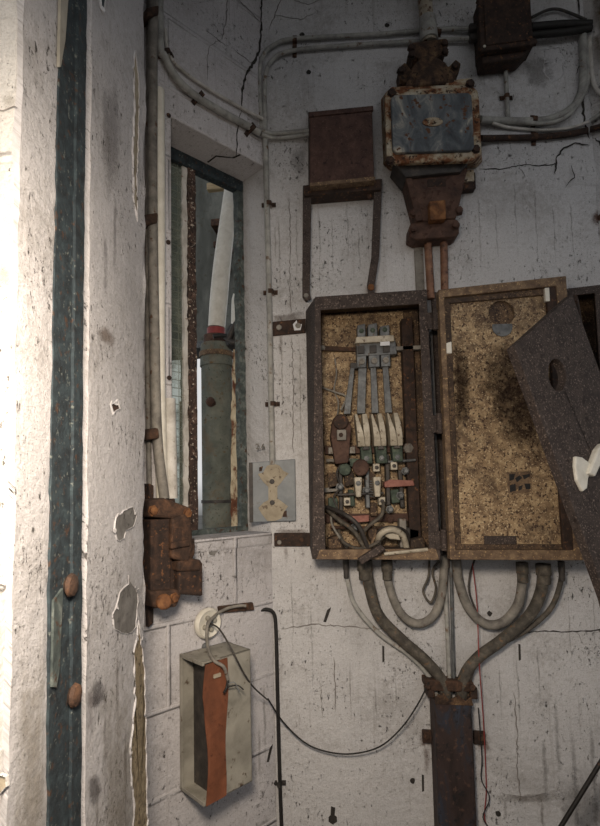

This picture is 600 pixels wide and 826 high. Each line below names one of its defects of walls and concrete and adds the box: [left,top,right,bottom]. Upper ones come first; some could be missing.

crack [207,0,319,163]
crack [485,163,555,176]
peeling [113,506,137,542]
spalling [112,575,149,826]